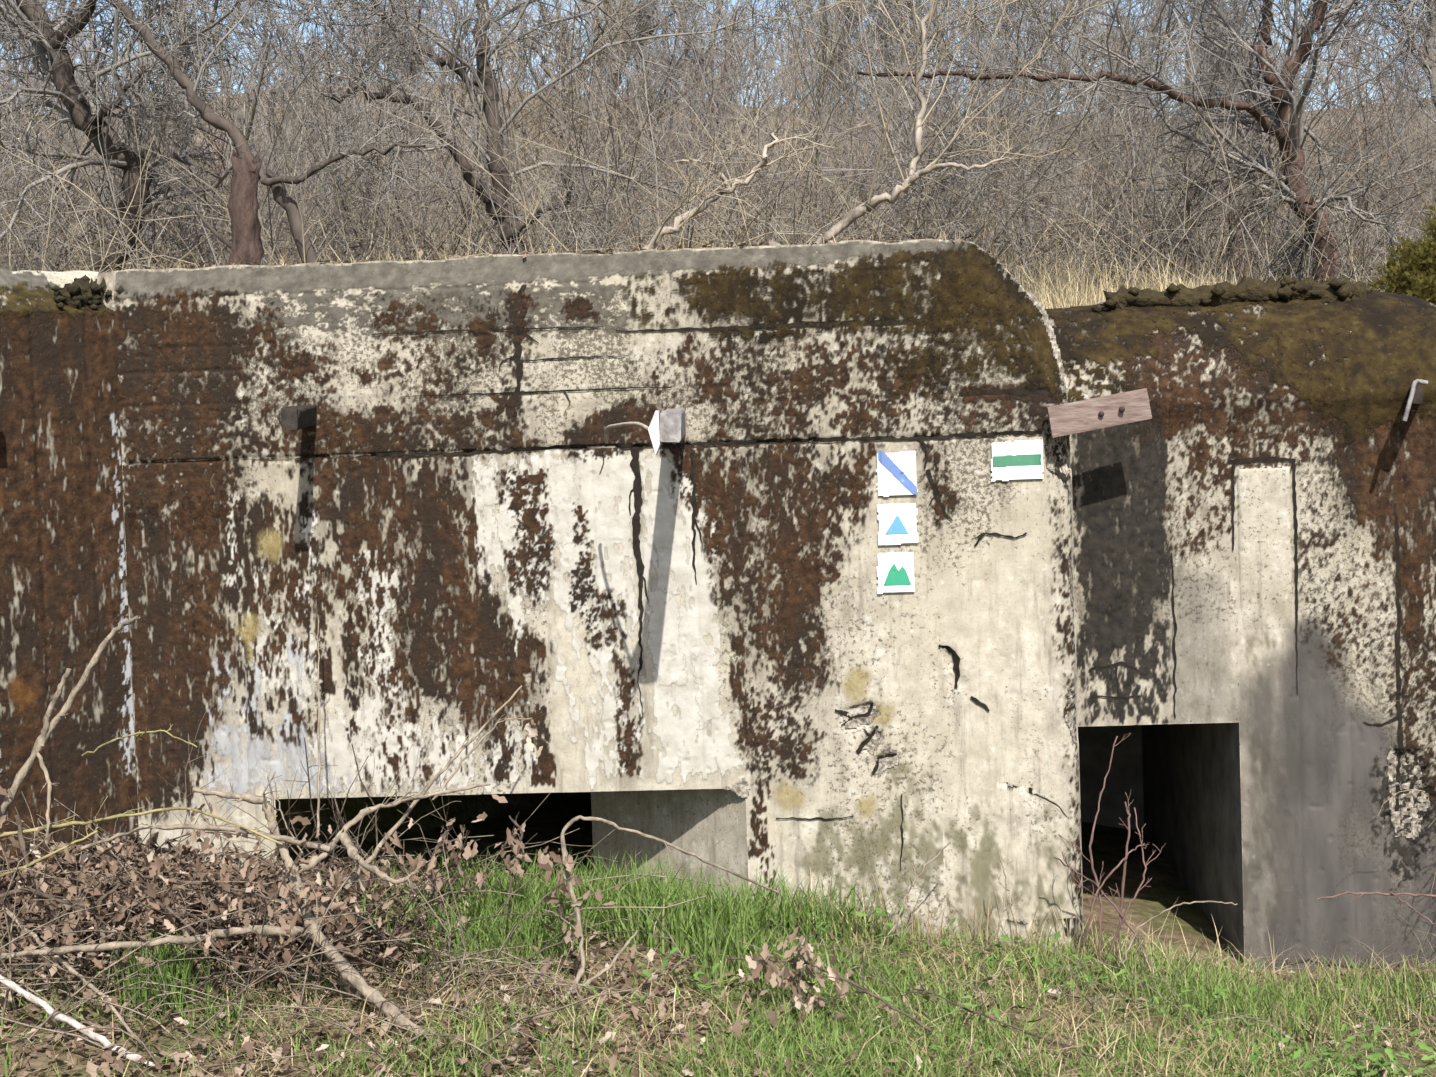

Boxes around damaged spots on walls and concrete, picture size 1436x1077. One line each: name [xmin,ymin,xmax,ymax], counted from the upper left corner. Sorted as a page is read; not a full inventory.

leakage [110,413,136,775]
leakage [728,632,759,747]
leakage [748,763,777,901]
spalling [843,701,899,777]
leakage [1249,598,1436,970]